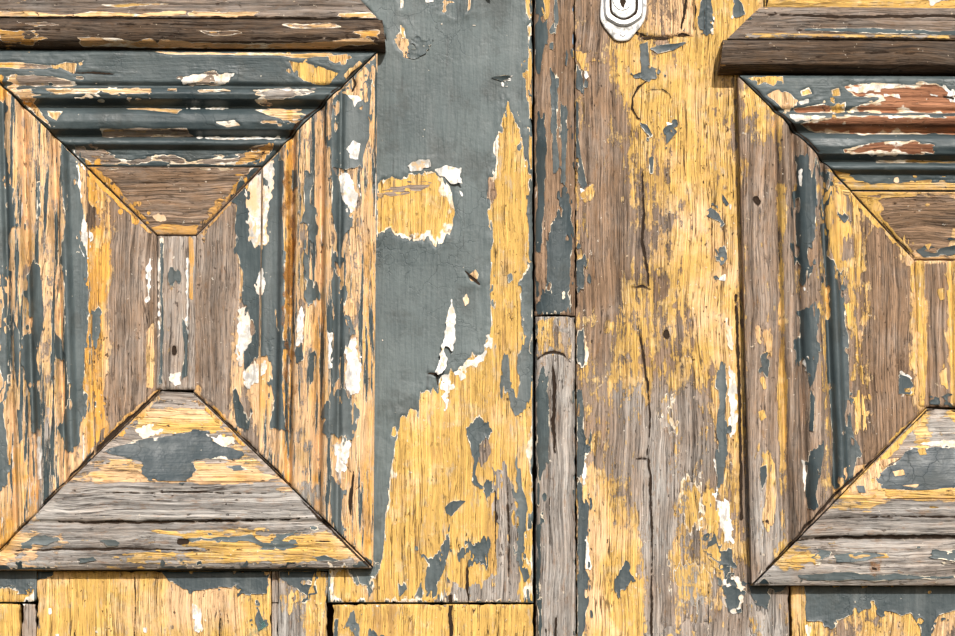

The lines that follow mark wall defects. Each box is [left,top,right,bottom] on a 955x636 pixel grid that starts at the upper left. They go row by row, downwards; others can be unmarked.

peeling [697,0,715,36]
peeling [731,0,752,20]
peeling [631,29,686,83]
peeling [640,119,678,149]
peeling [749,76,955,163]
peeling [707,194,732,227]
peeling [0,0,599,636]
peeling [755,325,773,390]
peeling [790,154,955,510]
peeling [666,361,786,636]
peeling [612,560,637,598]
peeling [791,549,955,636]